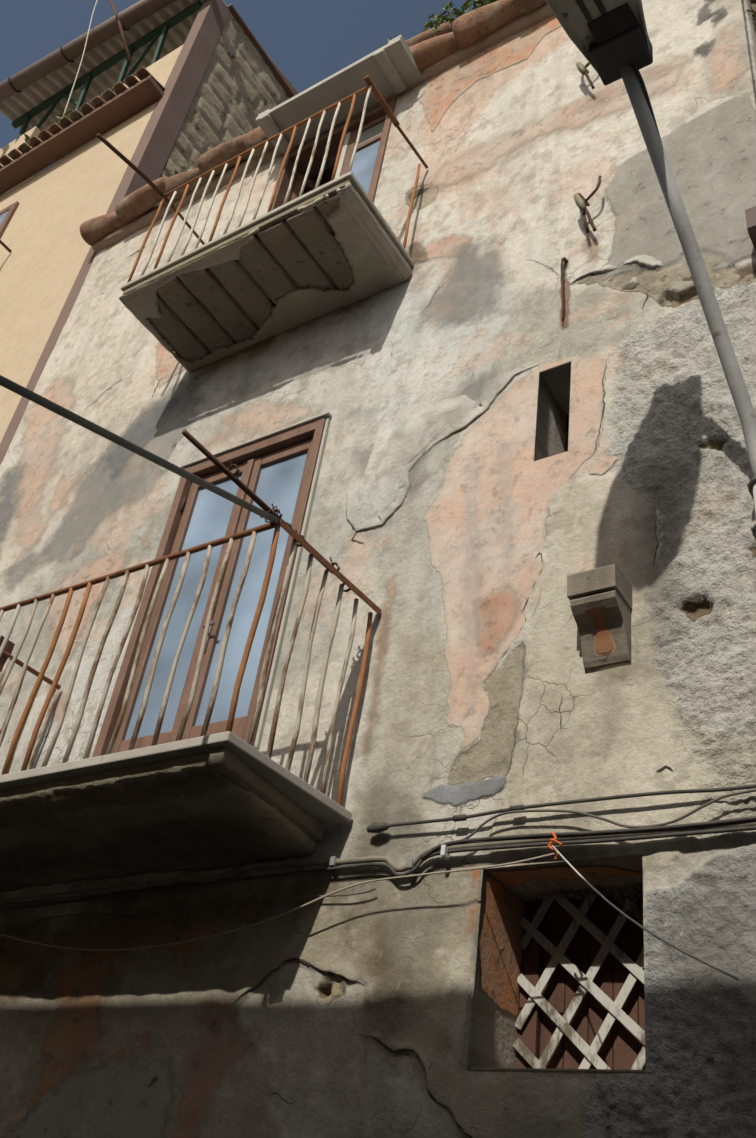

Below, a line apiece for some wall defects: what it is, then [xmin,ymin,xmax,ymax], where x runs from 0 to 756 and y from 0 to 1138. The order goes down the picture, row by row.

damp [431,245,499,322]
corrosion [560,257,570,328]
peeling [155,342,185,388]
damp [8,336,273,587]
crack [346,354,540,543]
damp [0,467,24,541]
peeling [424,354,618,787]
spalling [681,600,713,622]
crack [229,935,369,1004]
spalling [317,976,345,1006]
crack [357,1020,501,1138]